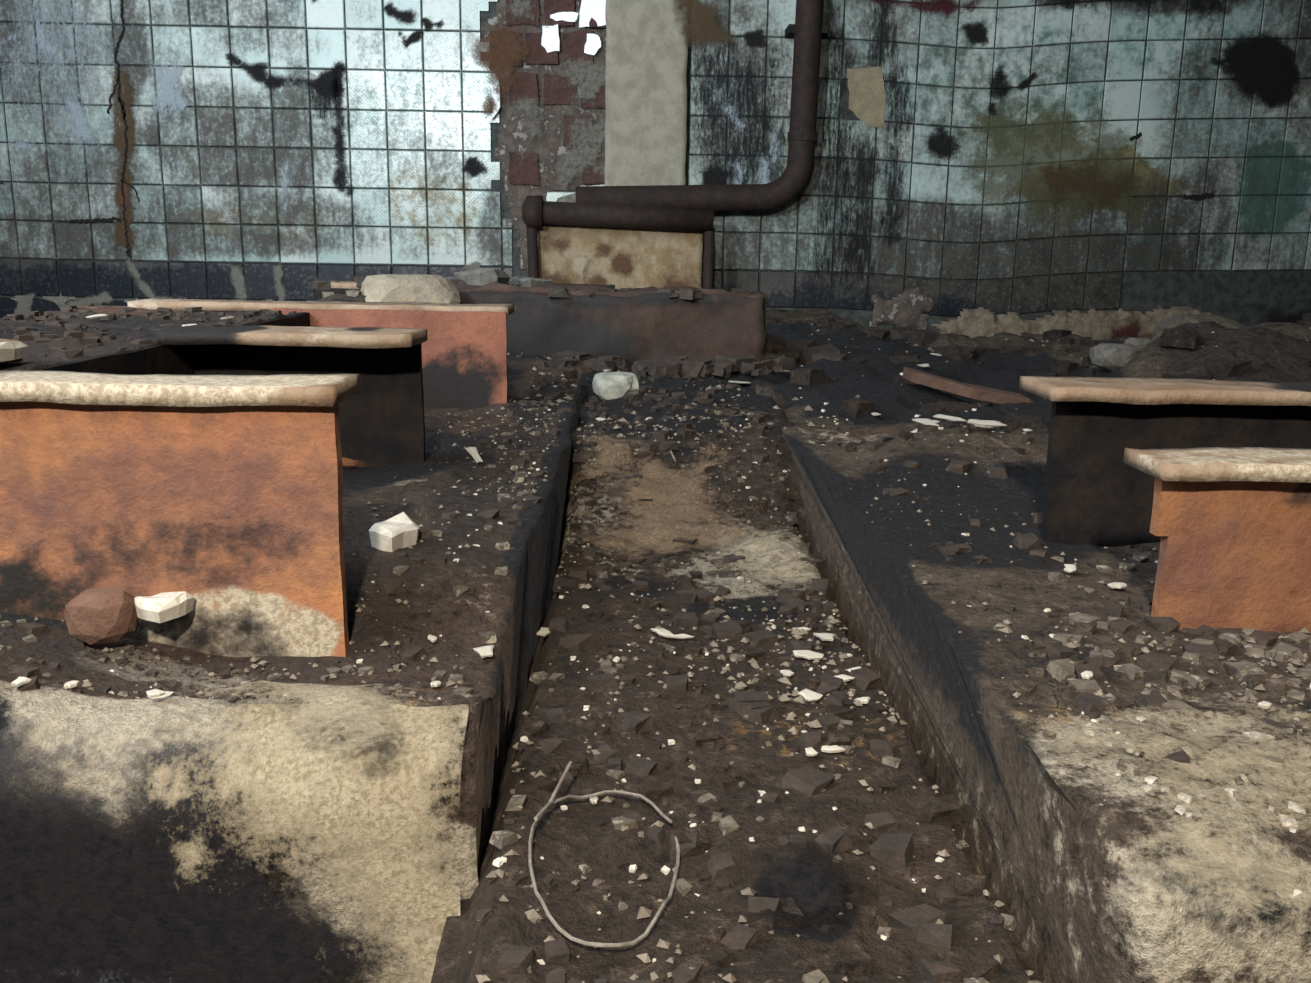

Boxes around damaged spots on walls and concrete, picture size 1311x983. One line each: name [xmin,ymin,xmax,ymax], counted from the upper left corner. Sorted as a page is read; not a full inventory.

rust [673,0,732,47]
leakage [744,29,766,47]
crack [69,0,139,257]
leakage [302,62,348,191]
flaking render [490,0,606,203]
leakage [716,103,745,133]
leakage [702,131,783,185]
leakage [839,1,928,283]
spalling [0,259,201,318]
spalling [230,264,286,301]
spalling [869,287,1212,340]
spalling [1267,306,1311,323]